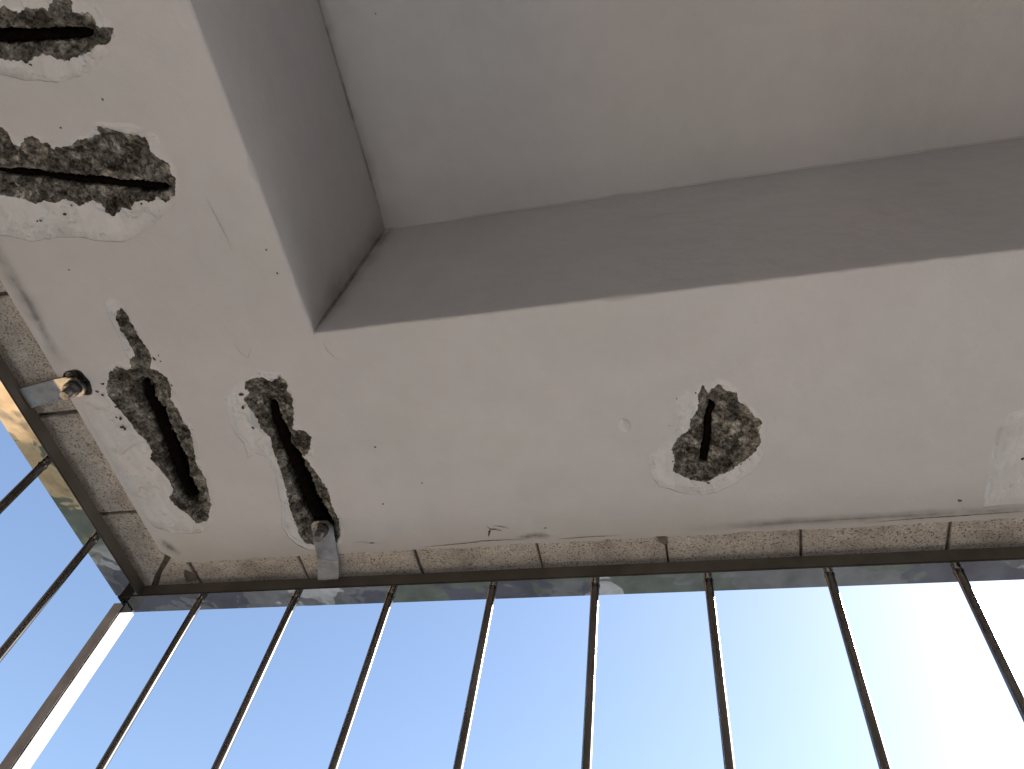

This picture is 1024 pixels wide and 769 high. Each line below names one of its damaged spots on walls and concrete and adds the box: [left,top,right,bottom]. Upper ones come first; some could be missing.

spalling [0,0,118,83]
spalling [0,121,182,242]
spalling [63,296,216,534]
spalling [225,371,344,550]
spalling [648,378,767,495]